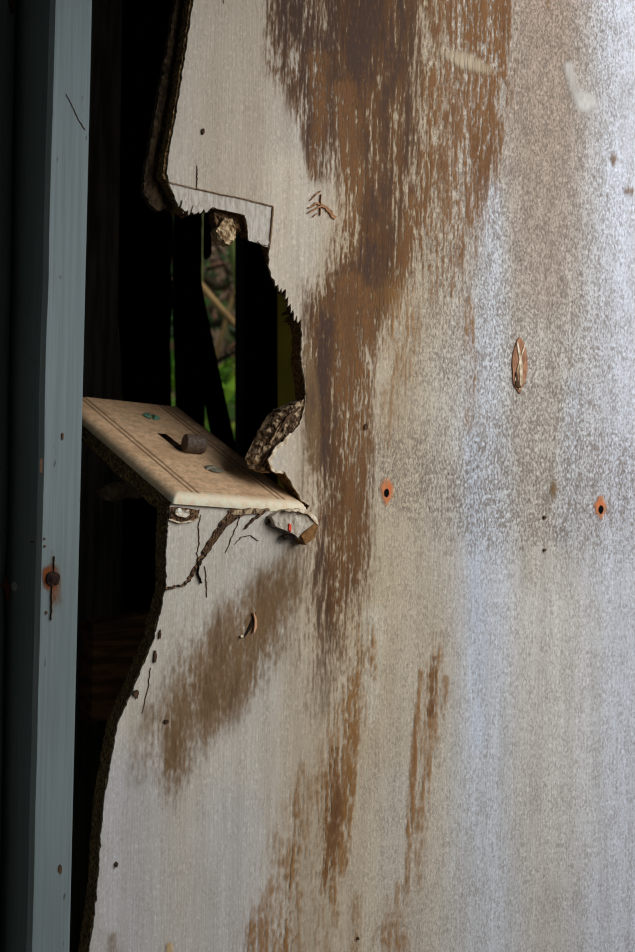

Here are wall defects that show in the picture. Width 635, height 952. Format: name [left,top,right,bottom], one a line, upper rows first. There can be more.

peeling [167,181,274,250]
peeling [267,433,291,474]
spalling [168,507,200,523]
peeling [267,508,319,545]
corrosion [381,479,393,505]
corrosion [595,496,606,519]
crack [164,508,270,597]
corrosion [43,556,60,620]
peeling [240,612,257,638]
corrosion [317,626,377,933]
corrosion [406,645,448,883]